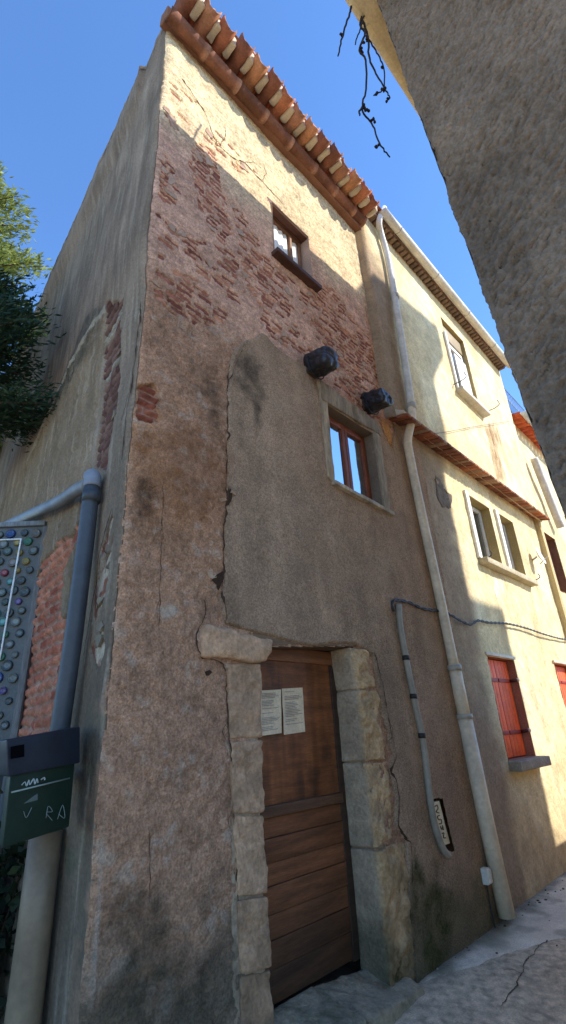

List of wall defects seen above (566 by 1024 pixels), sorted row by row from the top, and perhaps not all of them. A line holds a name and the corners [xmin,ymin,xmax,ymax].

crack [180,76,283,204]
spalling [97,298,124,470]
spalling [136,386,159,423]
spalling [150,128,392,447]
crack [196,346,244,767]
crack [374,652,413,884]